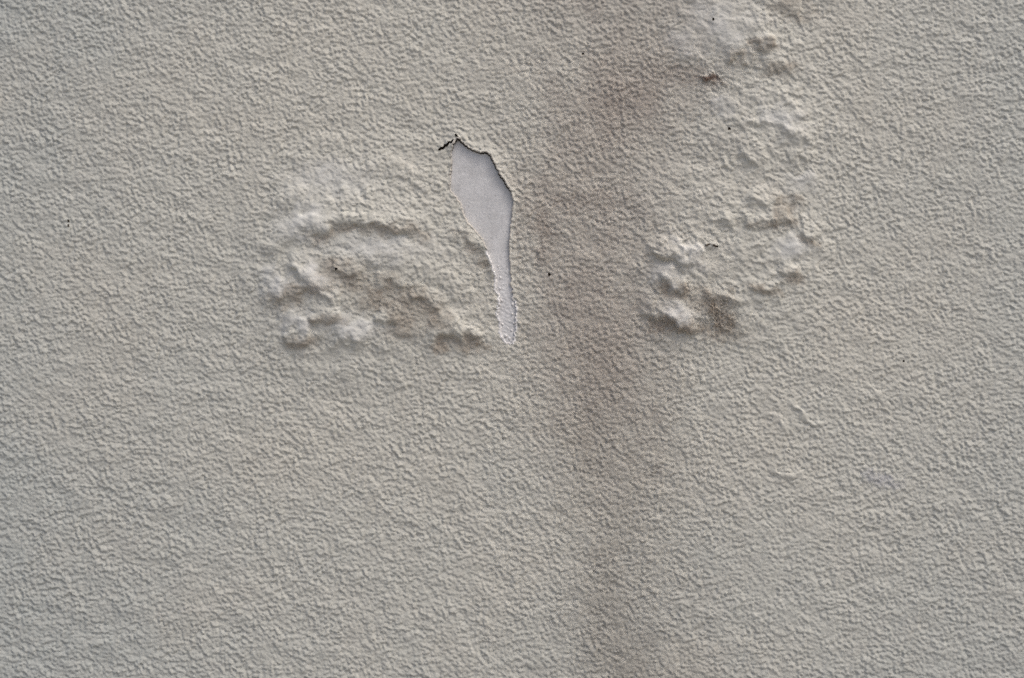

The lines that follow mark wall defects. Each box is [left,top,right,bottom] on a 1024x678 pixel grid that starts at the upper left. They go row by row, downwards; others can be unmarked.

peeling [448,137,518,345]